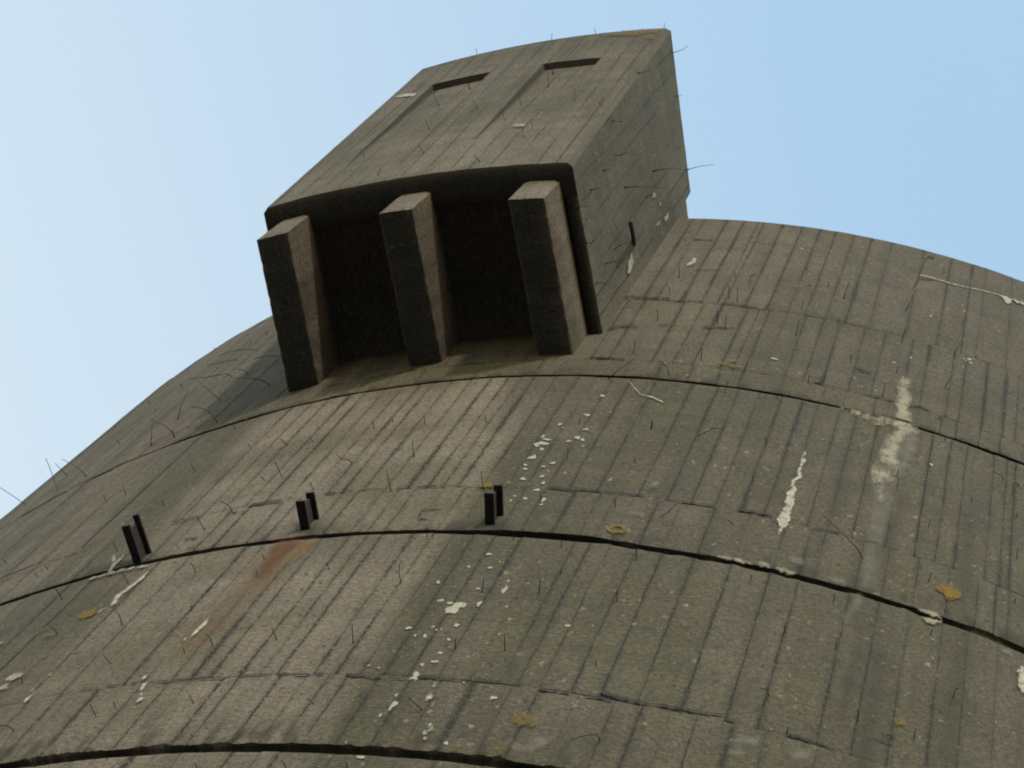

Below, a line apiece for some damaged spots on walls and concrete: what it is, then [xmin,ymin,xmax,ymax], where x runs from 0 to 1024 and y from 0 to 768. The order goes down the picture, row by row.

crack [233,496,298,513]
crack [324,485,463,519]
leakage [777,451,806,533]
leakage [841,377,915,585]
corrosion [268,540,314,565]